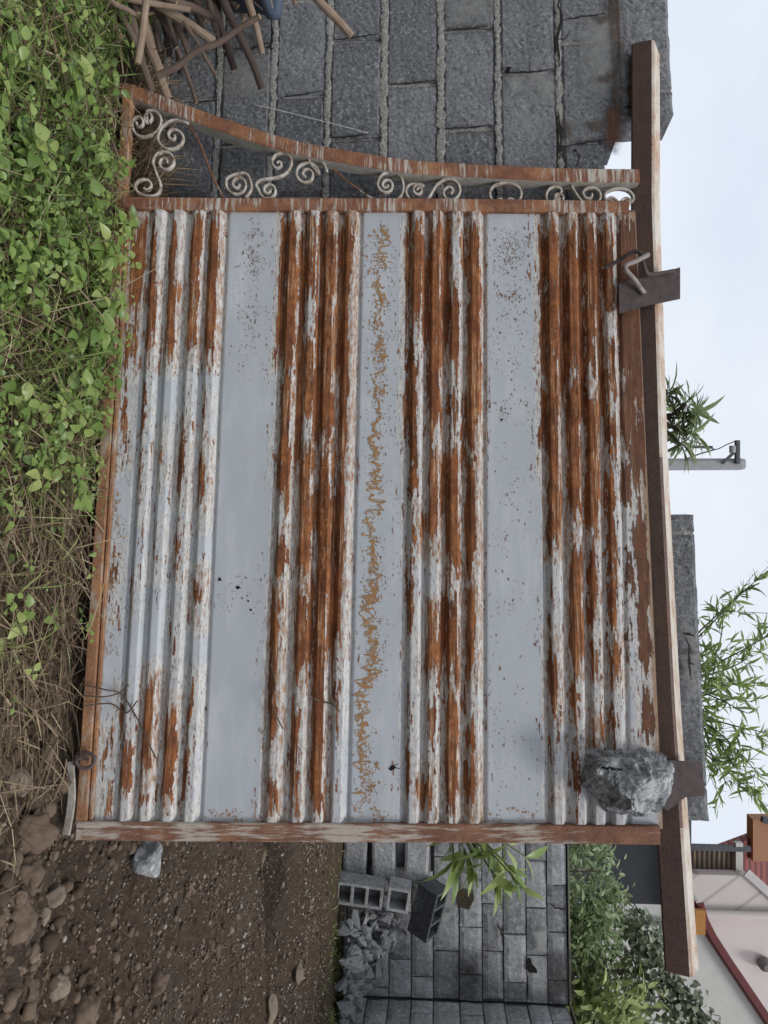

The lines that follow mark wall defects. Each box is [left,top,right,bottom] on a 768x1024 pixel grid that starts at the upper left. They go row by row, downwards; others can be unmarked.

rust [607,112,620,145]
rust [98,209,227,818]
rust [252,210,494,824]
peeling [353,532,403,696]
peeling [356,221,403,522]
rust [524,211,656,825]
peeling [351,709,396,821]